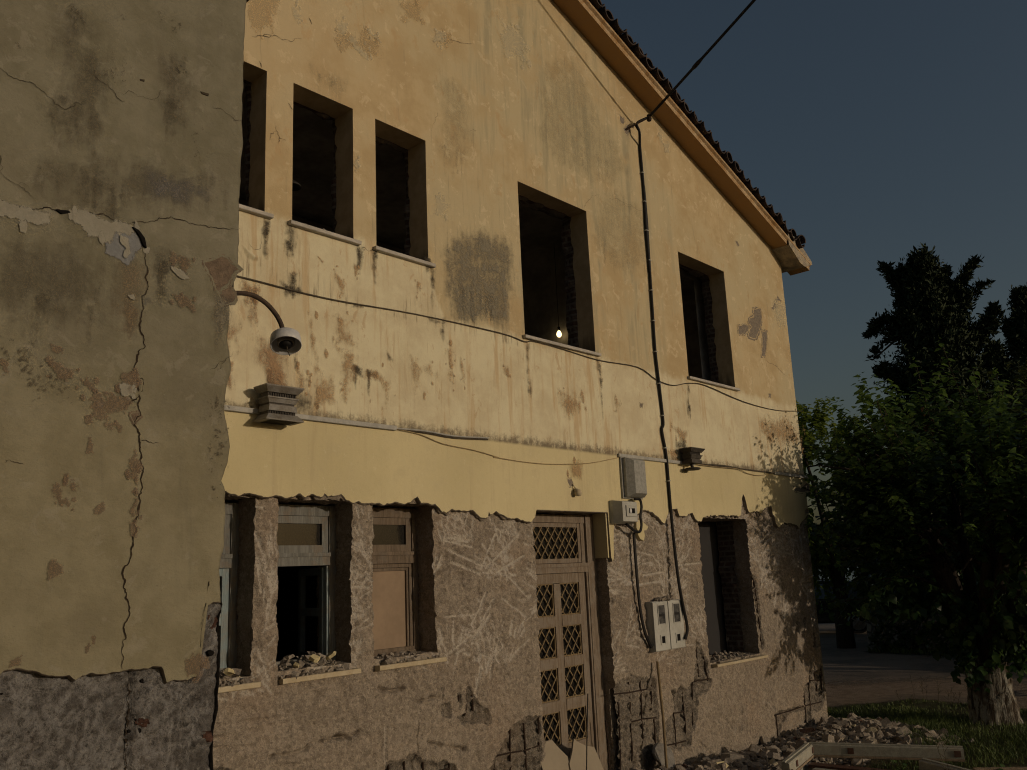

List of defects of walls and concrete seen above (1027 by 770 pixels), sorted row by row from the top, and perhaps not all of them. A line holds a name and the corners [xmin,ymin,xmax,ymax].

peeling [68,206,150,265]
spalling [169,251,261,313]
leakage [447,233,510,323]
spalling [737,295,782,358]
crack [89,212,233,770]
spalling [225,491,665,562]
spalling [672,494,809,529]
spalling [441,687,492,726]
spalling [605,642,712,770]
spalling [774,667,825,738]
spalling [385,753,456,770]
spalling [489,716,543,770]